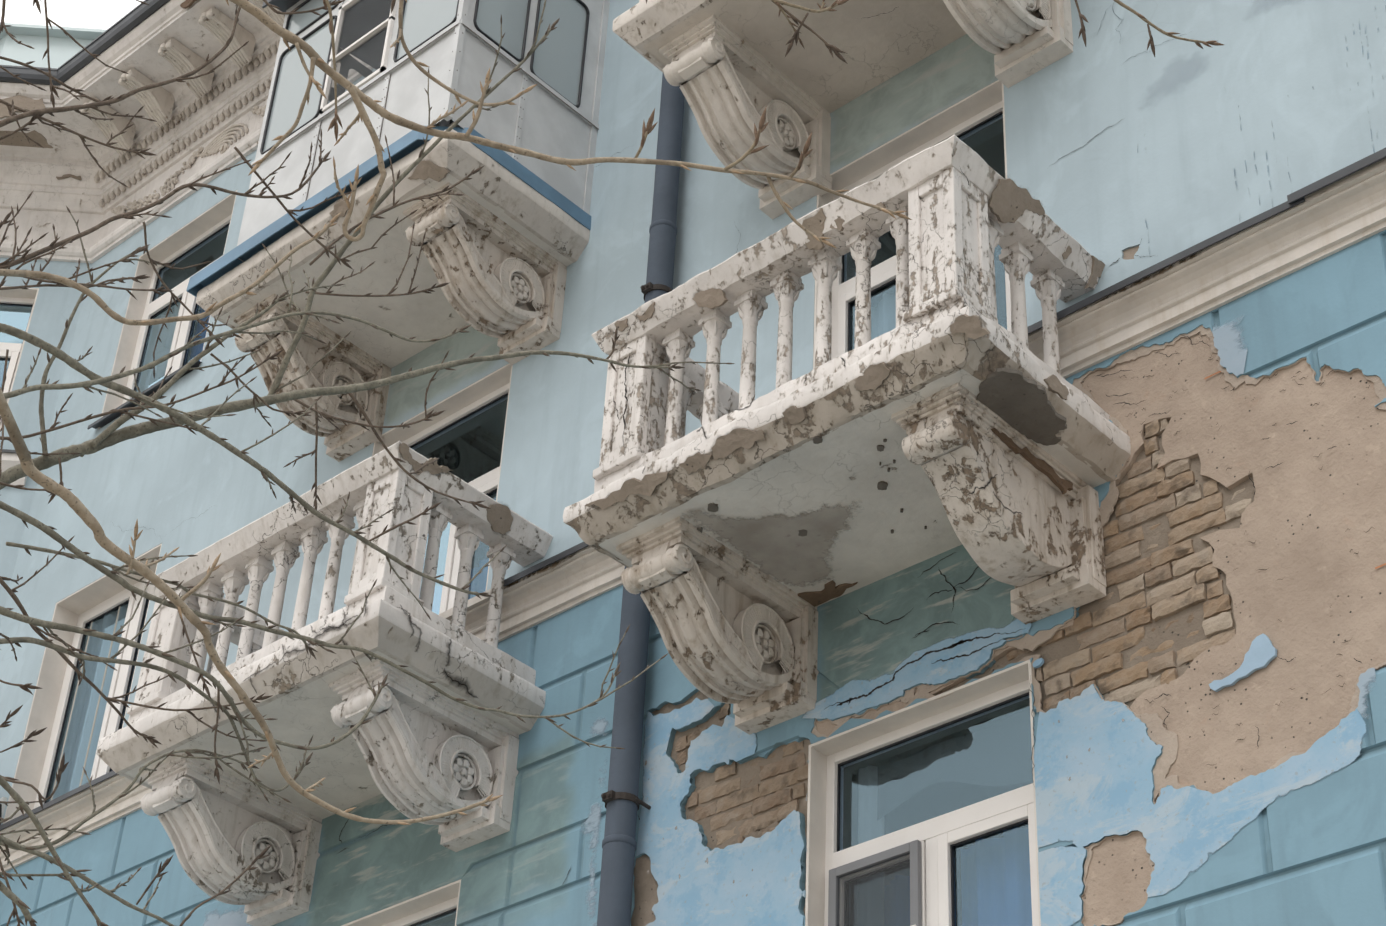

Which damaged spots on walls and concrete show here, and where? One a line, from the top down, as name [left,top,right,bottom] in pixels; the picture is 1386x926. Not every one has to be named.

spalling [988,178,1045,223]
spalling [802,208,845,250]
spalling [615,302,655,331]
spalling [692,288,728,309]
spalling [950,314,990,340]
spalling [585,428,766,510]
spalling [486,504,513,534]
crack [824,552,1021,710]
flaking render [631,323,1386,926]